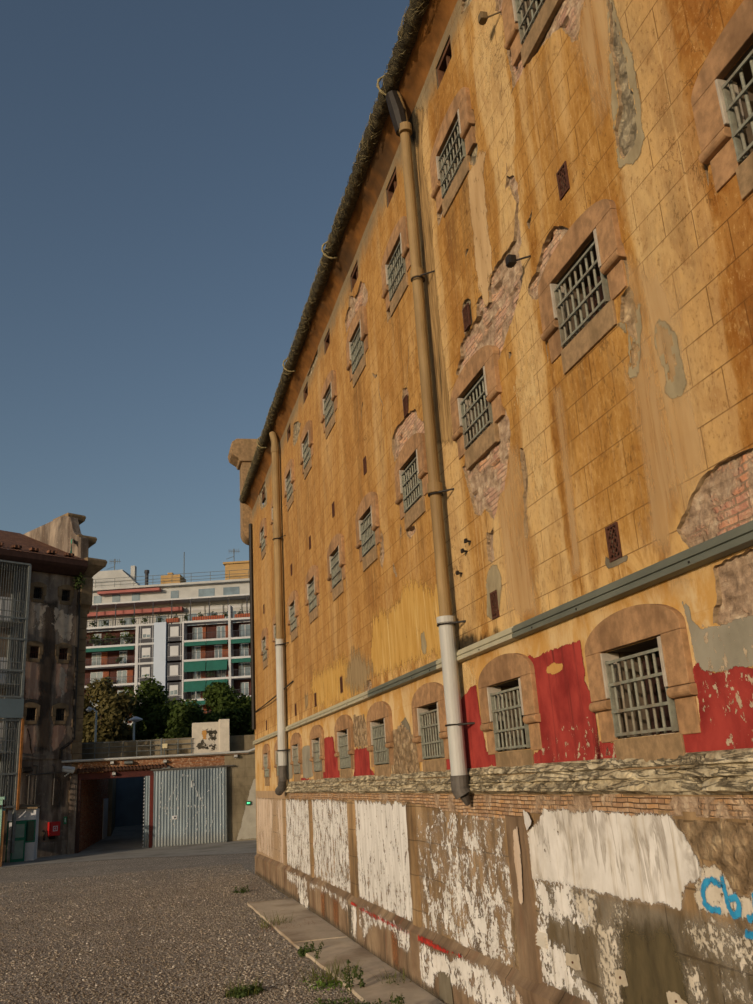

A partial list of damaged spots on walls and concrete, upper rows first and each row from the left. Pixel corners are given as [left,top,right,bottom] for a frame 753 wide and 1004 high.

spalling [507,0,584,93]
spalling [607,0,644,168]
spalling [617,286,642,378]
spalling [654,319,687,399]
spalling [462,410,529,563]
spalling [677,448,753,548]
peeling [528,640,627,764]
peeling [648,549,753,753]
peeling [257,685,753,1004]